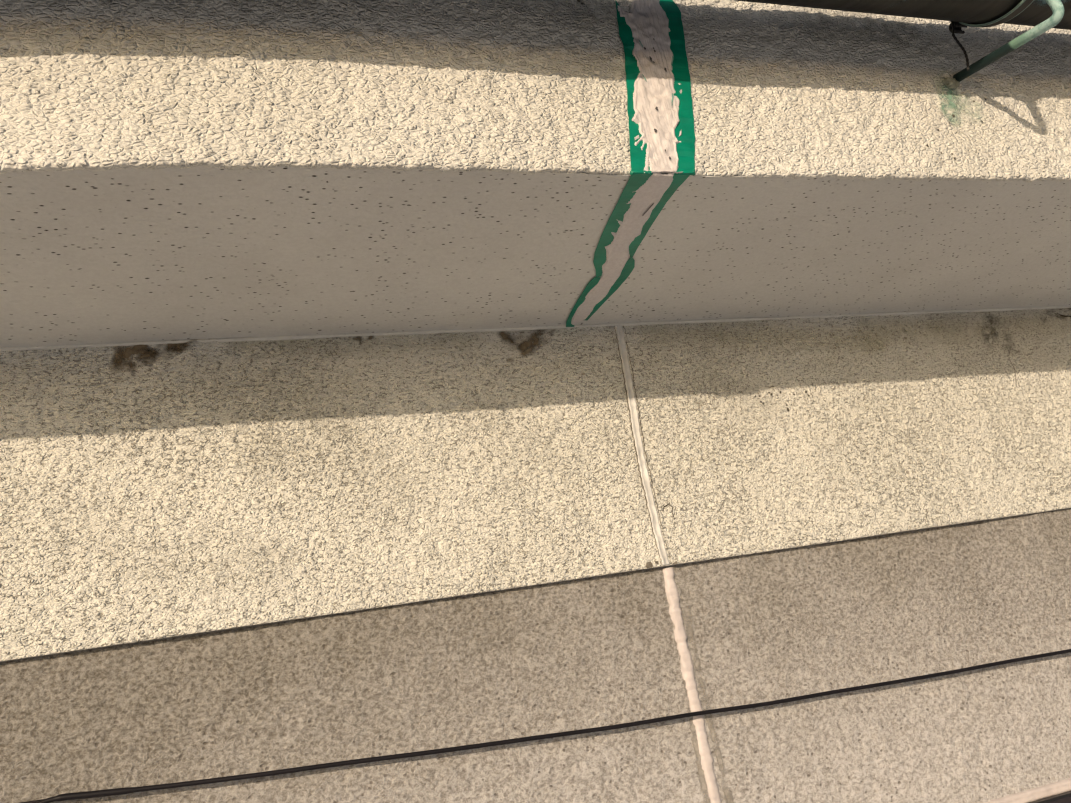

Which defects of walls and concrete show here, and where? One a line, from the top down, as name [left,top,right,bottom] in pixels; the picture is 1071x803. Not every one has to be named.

corrosion [115,340,192,369]